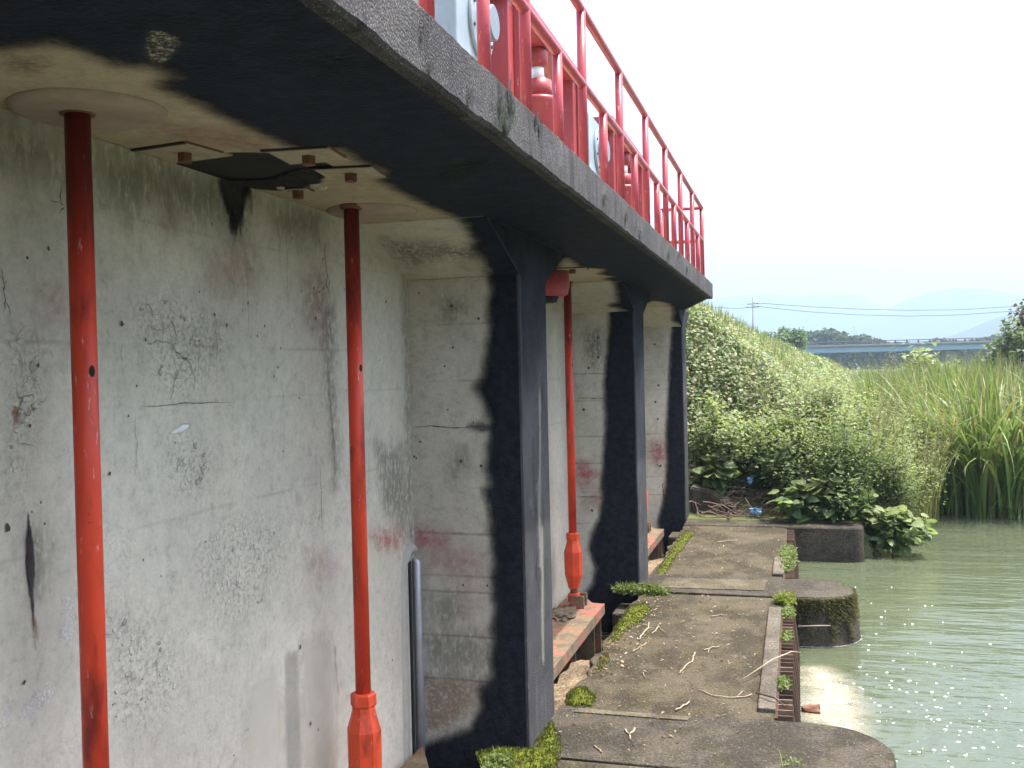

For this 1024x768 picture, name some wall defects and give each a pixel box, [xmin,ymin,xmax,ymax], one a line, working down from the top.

crack [16,387,35,416]
crack [135,304,228,478]
leakage [0,0,707,768]